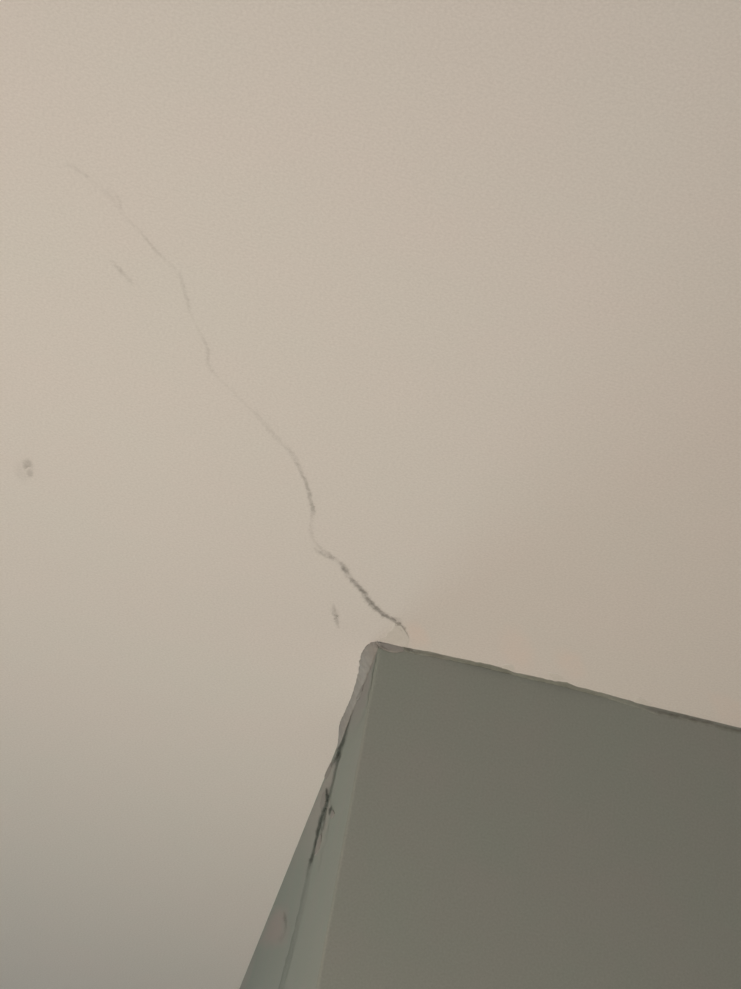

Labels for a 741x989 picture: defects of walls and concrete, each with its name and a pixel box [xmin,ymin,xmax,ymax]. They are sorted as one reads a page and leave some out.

crack [275,790,328,989]